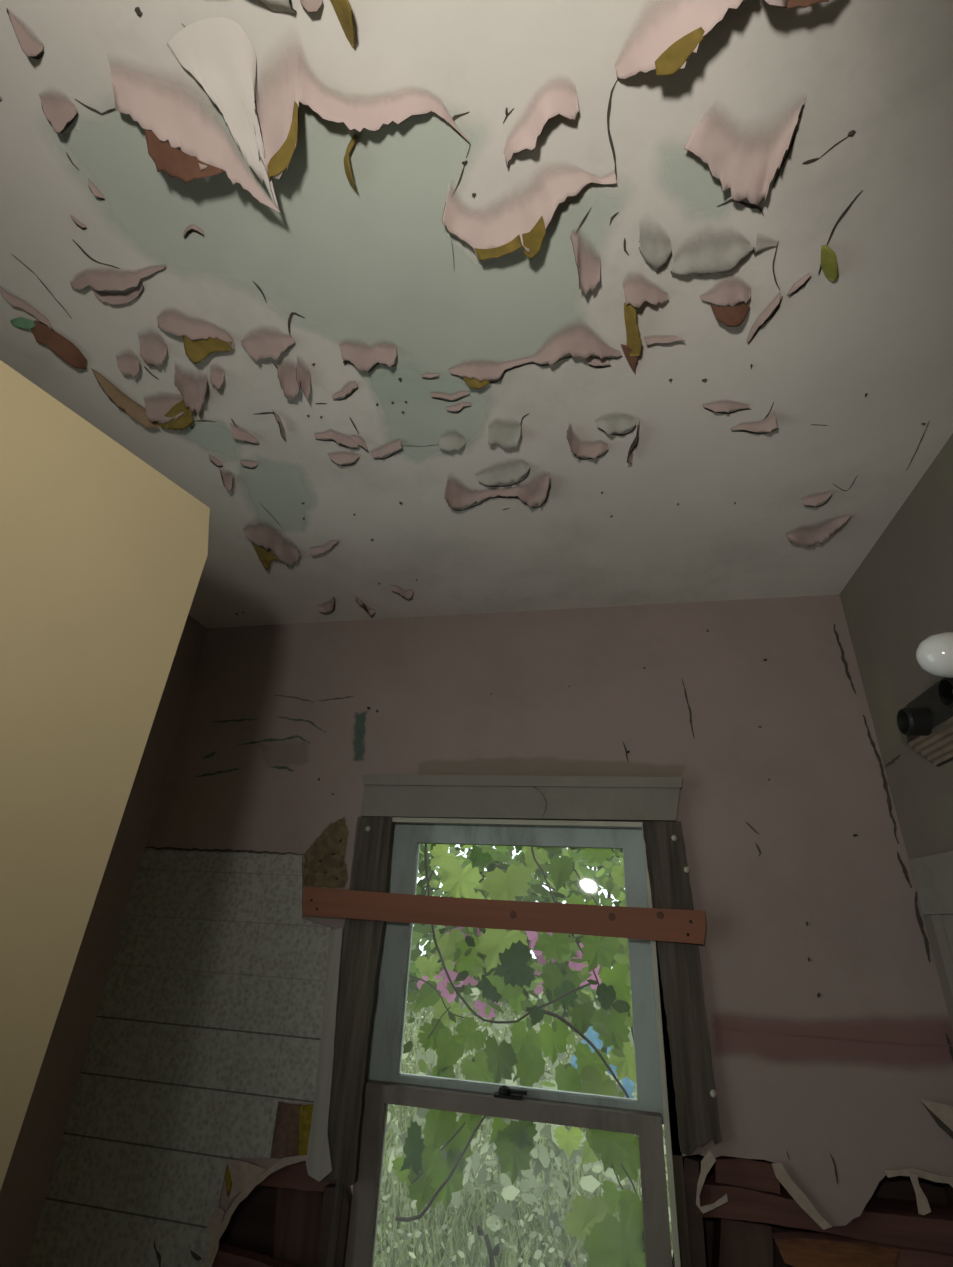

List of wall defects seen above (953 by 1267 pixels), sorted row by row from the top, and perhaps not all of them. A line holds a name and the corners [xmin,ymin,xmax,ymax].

peeling [39,0,744,261]
peeling [684,99,806,216]
peeling [802,130,856,164]
peeling [70,215,166,305]
peeling [0,287,465,466]
peeling [567,416,639,464]
peeling [444,461,550,511]
crack [834,624,930,962]
spalling [204,1155,307,1267]
spalling [696,1150,728,1214]
spalling [771,1163,832,1230]
spalling [884,1168,953,1215]